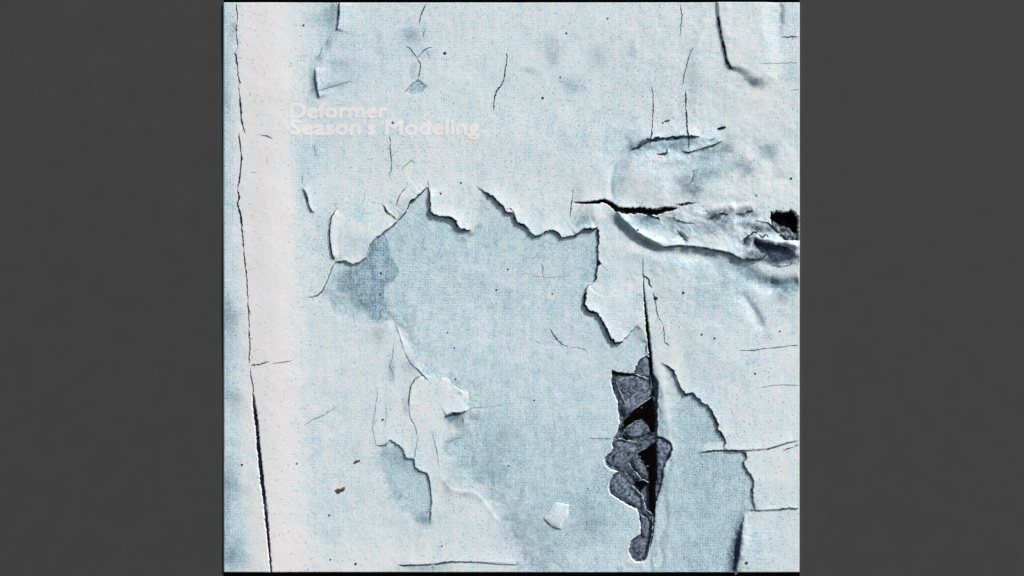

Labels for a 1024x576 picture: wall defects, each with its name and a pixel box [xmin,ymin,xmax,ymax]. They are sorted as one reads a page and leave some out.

crack [235,4,293,573]
peeling [307,187,755,575]
crack [643,262,669,397]
crack [570,7,764,261]